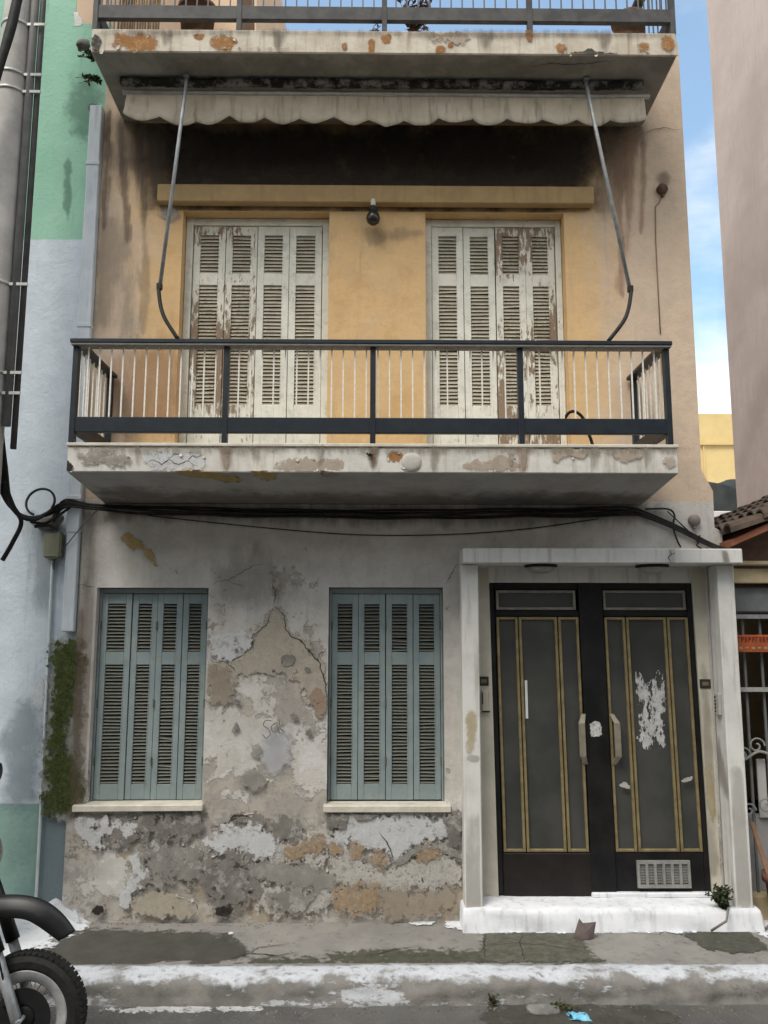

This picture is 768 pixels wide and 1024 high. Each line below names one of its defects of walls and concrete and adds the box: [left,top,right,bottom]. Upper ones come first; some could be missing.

peeling [430,31,470,45]
spalling [562,48,617,57]
peeling [67,447,344,483]
peeling [463,455,520,472]
peeling [552,447,588,462]
peeling [121,532,157,567]
crack [211,564,328,702]
spalling [206,607,328,719]
peeling [241,714,313,792]
peeling [74,809,462,923]